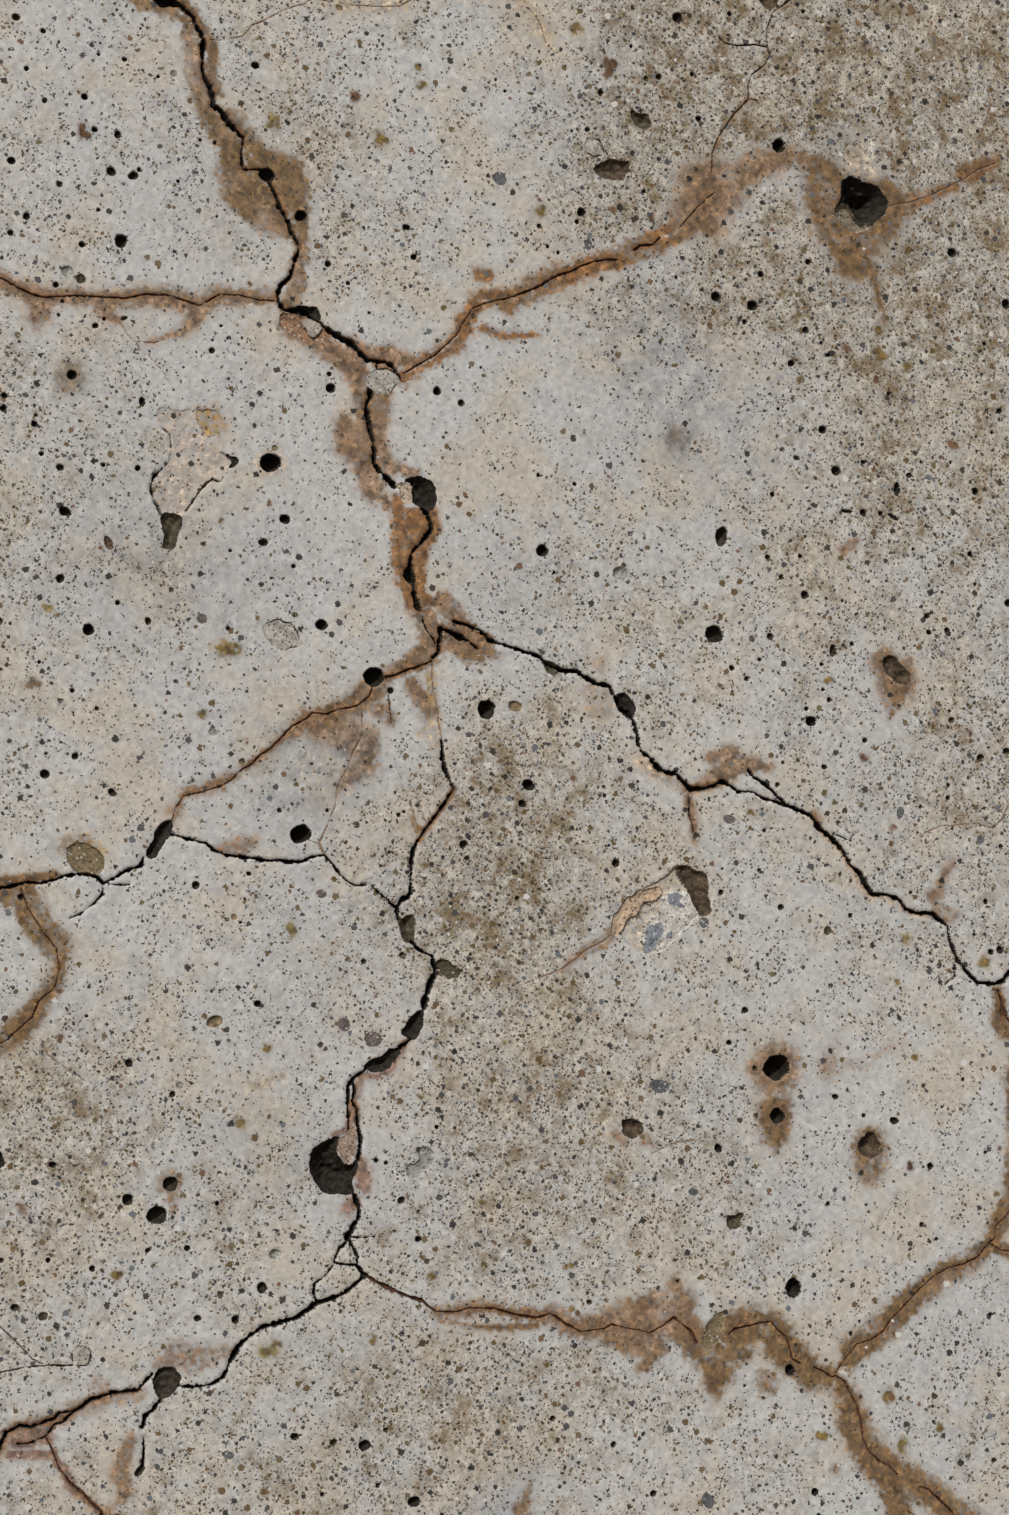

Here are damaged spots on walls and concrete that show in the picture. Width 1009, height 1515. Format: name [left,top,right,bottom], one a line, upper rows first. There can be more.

crack [887,66,1008,207]
crack [0,0,790,489]
crack [149,468,219,515]
crack [0,511,1009,1081]
spalling [611,864,713,954]
crack [0,1070,1009,1515]
damp [474,1440,559,1515]